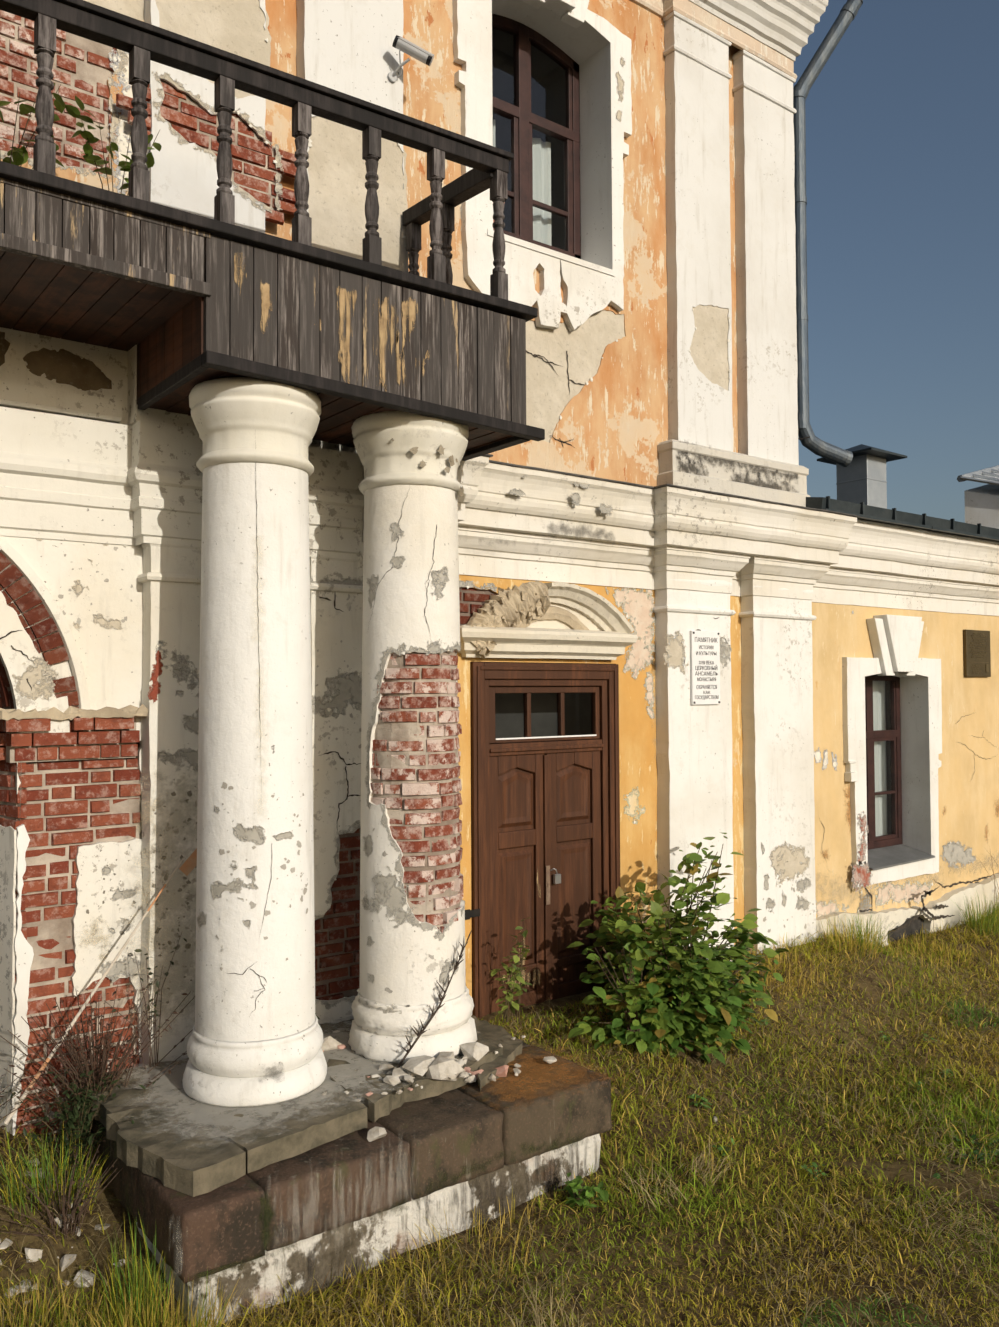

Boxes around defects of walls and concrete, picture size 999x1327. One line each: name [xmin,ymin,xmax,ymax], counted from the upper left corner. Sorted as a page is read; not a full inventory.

flaking render [0,0,409,273]
crack [526,350,585,394]
flaking render [526,310,625,442]
flaking render [0,543,133,732]
crack [319,491,409,628]
crack [424,525,437,632]
flaking render [424,567,497,626]
flaking render [15,640,223,1136]
flaking render [211,639,465,1014]
crack [859,873,998,933]
crack [227,966,267,1017]
damp [454,1140,586,1221]